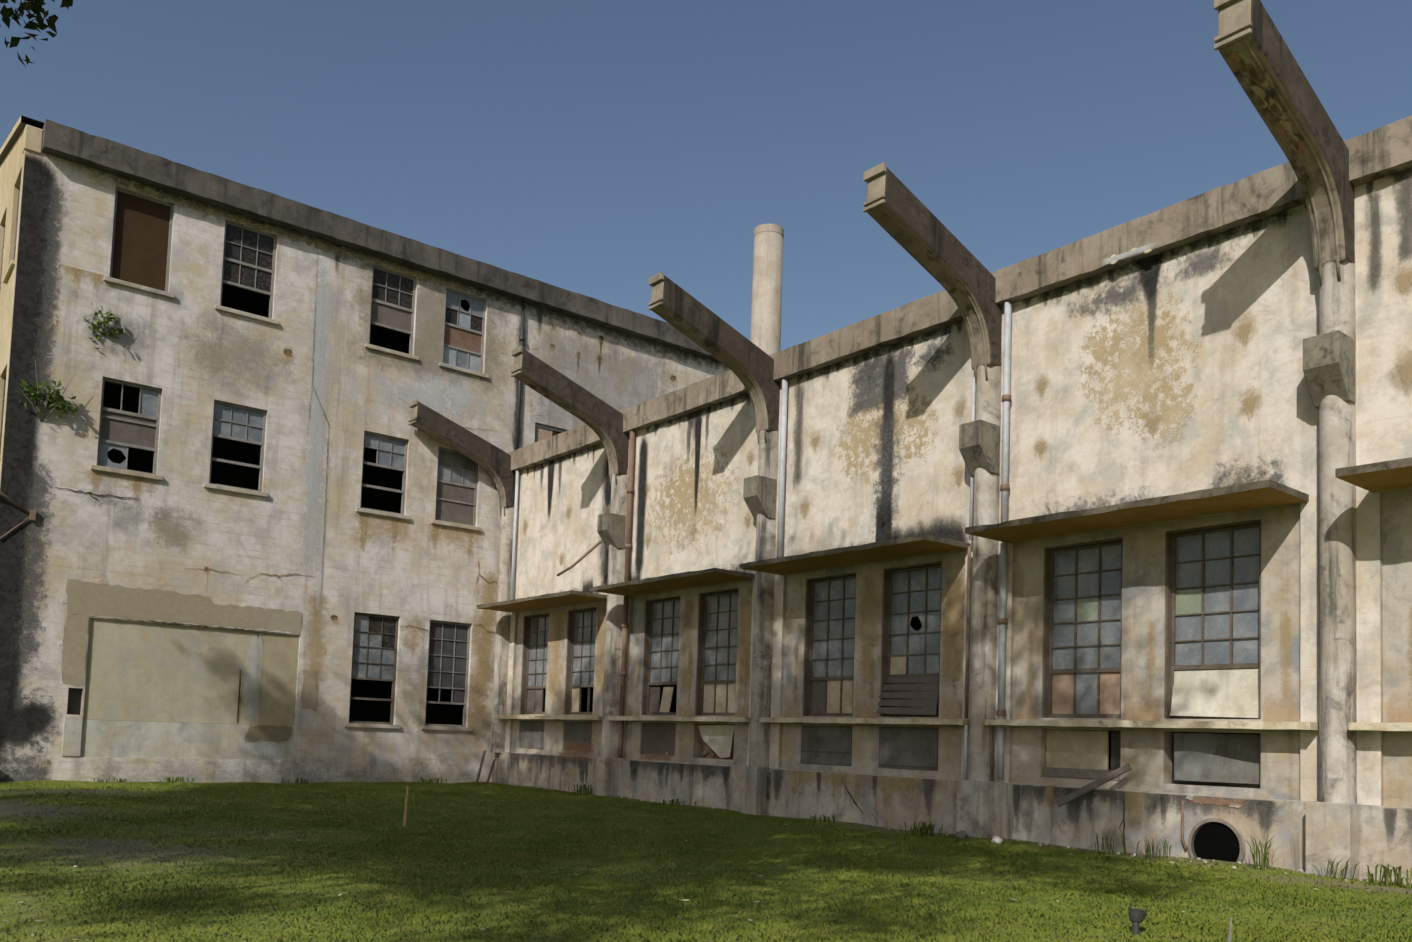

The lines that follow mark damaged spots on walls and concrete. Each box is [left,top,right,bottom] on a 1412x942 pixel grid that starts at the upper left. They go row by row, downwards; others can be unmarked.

leakage [1023,210,1288,354]
leakage [1366,167,1412,289]
leakage [0,155,64,782]
crack [55,487,136,500]
leakage [793,321,967,543]
leakage [922,779,935,810]
leakage [1013,784,1275,830]
leakage [1384,808,1412,834]